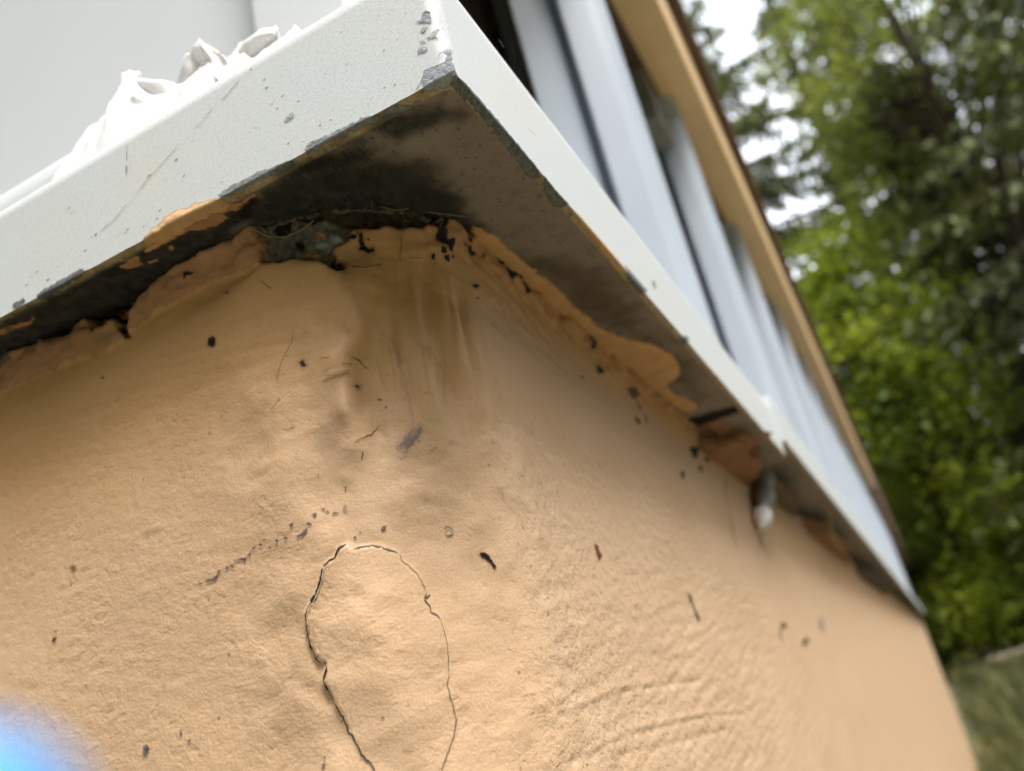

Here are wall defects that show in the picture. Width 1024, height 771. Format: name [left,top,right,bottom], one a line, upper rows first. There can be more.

water stain [376,109,459,139]
spalling [12,269,84,308]
flaking render [89,296,139,338]
water stain [0,140,482,355]
flaking render [257,207,532,293]
spalling [625,266,647,294]
crack [199,486,347,584]
crack [305,544,457,771]